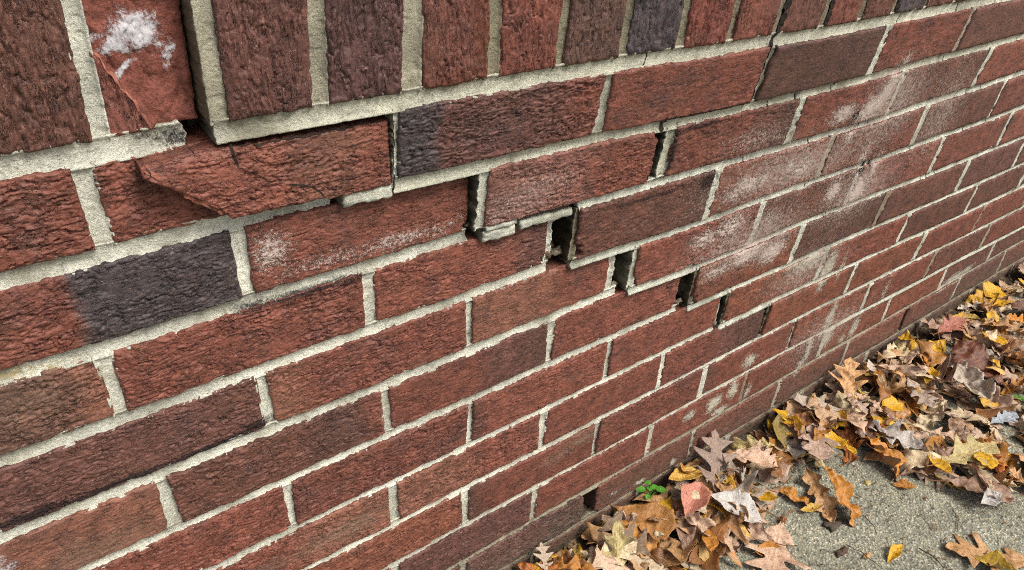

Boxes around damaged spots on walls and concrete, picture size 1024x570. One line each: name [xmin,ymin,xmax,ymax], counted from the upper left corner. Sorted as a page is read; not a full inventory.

leakage [89,12,176,77]
spalling [81,0,198,129]
crack [182,118,197,157]
crack [229,118,396,197]
leakage [668,52,978,301]
crack [545,240,562,259]